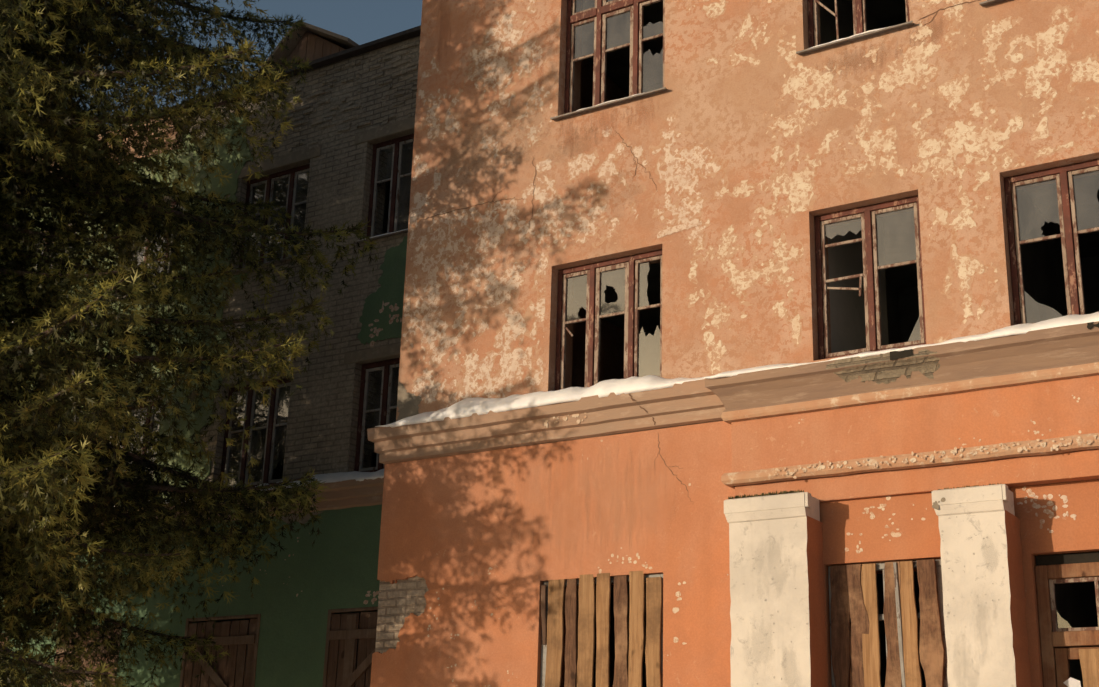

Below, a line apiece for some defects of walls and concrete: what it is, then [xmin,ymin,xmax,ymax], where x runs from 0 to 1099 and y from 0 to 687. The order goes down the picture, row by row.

crack [919,0,979,27]
peeling [357,0,1099,421]
crack [628,393,691,501]
peeling [774,420,1099,479]
peeling [1017,486,1076,533]
flaking render [363,560,459,686]